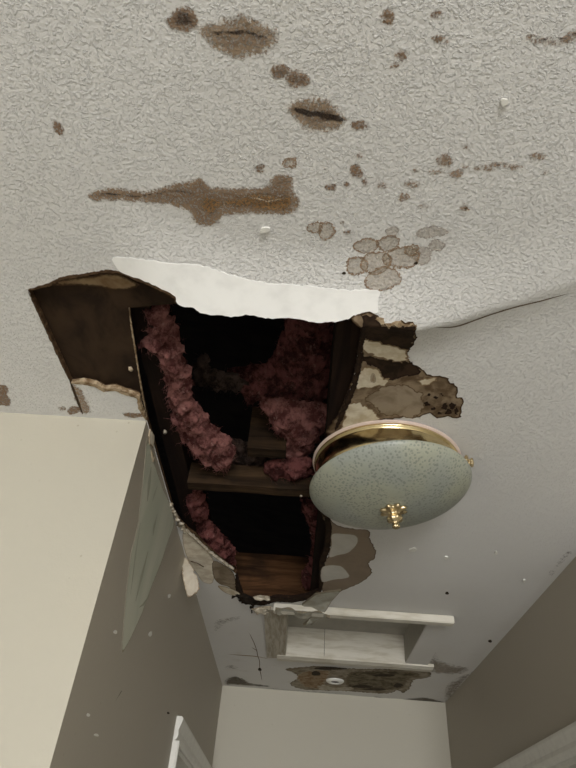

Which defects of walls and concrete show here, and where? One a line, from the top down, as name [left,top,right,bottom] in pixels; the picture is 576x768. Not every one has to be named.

water stain [167,6,278,59]
water stain [271,64,310,88]
water stain [289,98,367,132]
water stain [325,154,367,190]
water stain [307,220,351,241]
water stain [346,235,421,291]
peeling [351,339,410,390]
peeling [418,377,437,387]
peeling [340,401,382,429]
peeling [113,429,240,653]
peeling [302,513,376,618]
water stain [285,658,467,703]